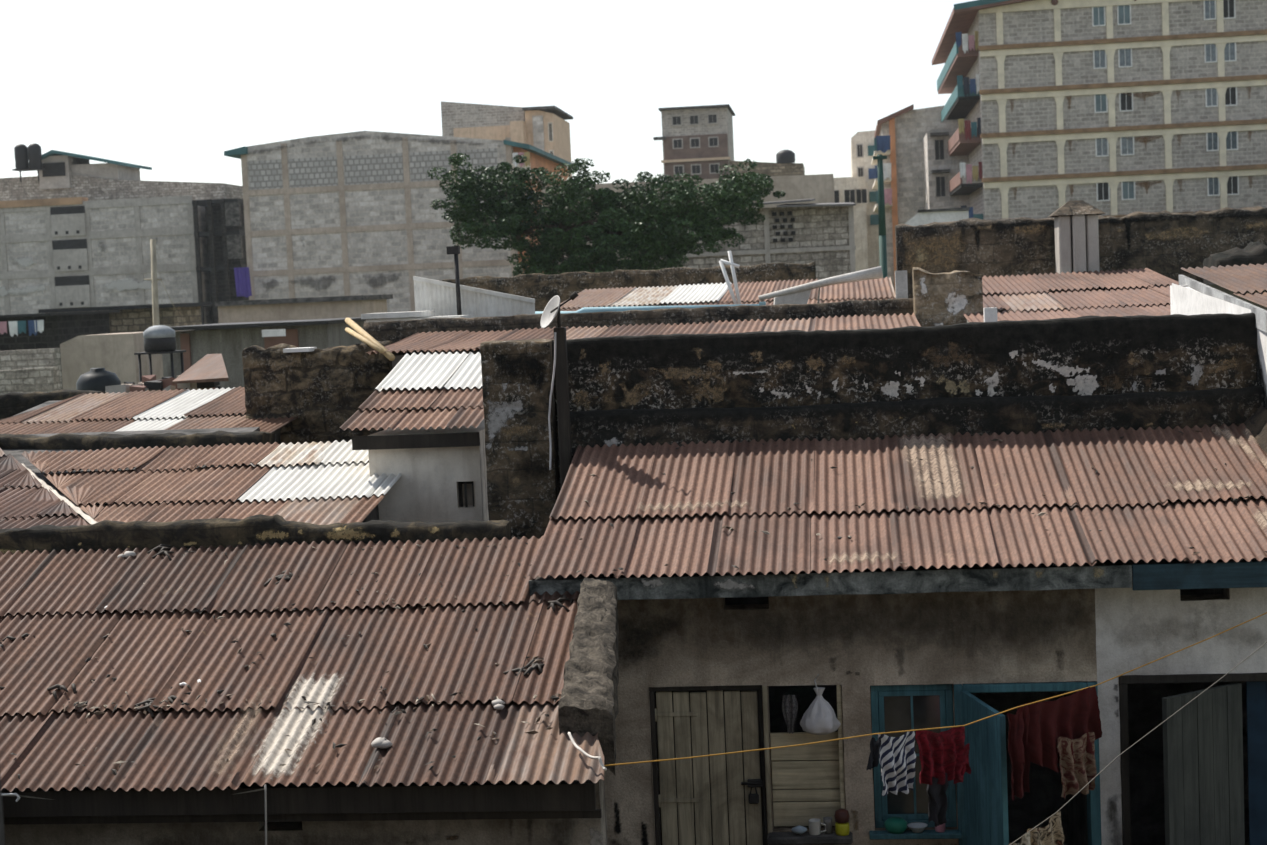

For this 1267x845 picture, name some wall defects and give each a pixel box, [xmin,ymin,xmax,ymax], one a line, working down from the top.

peeling [863,371,925,398]
peeling [975,371,1000,397]
peeling [1009,350,1099,396]
water stain [1256,349,1267,409]
corrosion [214,702,257,773]
water stain [641,822,649,845]